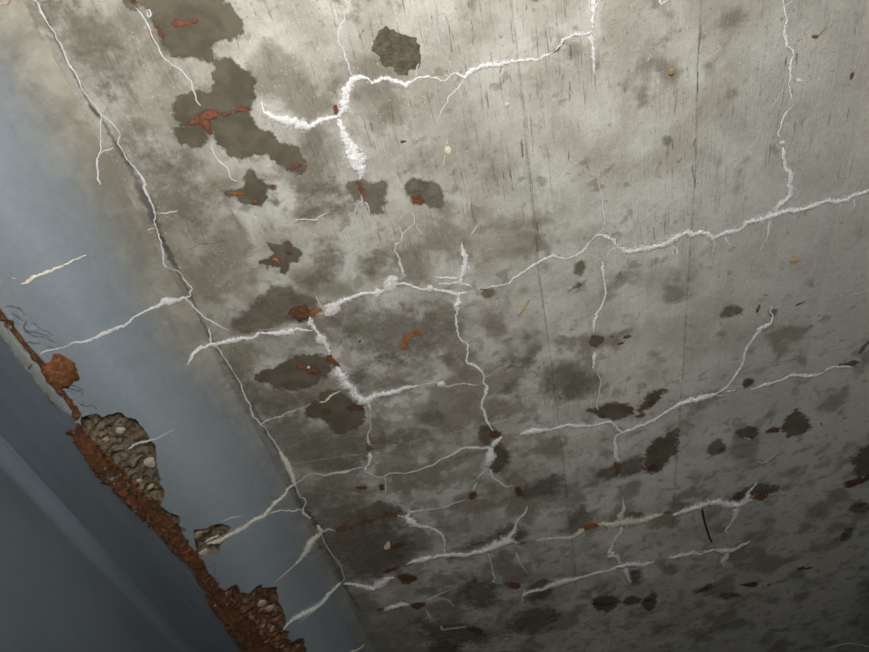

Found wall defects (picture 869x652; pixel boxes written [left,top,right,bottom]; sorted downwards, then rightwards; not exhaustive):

damp [123,0,308,175]
crack [13,255,86,285]
damp [225,170,276,206]
damp [233,287,323,333]
crack [34,0,779,604]
damp [406,178,443,208]
crack [480,147,869,332]
spalling [6,306,231,582]
rust [0,308,278,652]
damp [235,354,366,467]
spalling [223,584,306,652]
crack [276,525,394,629]